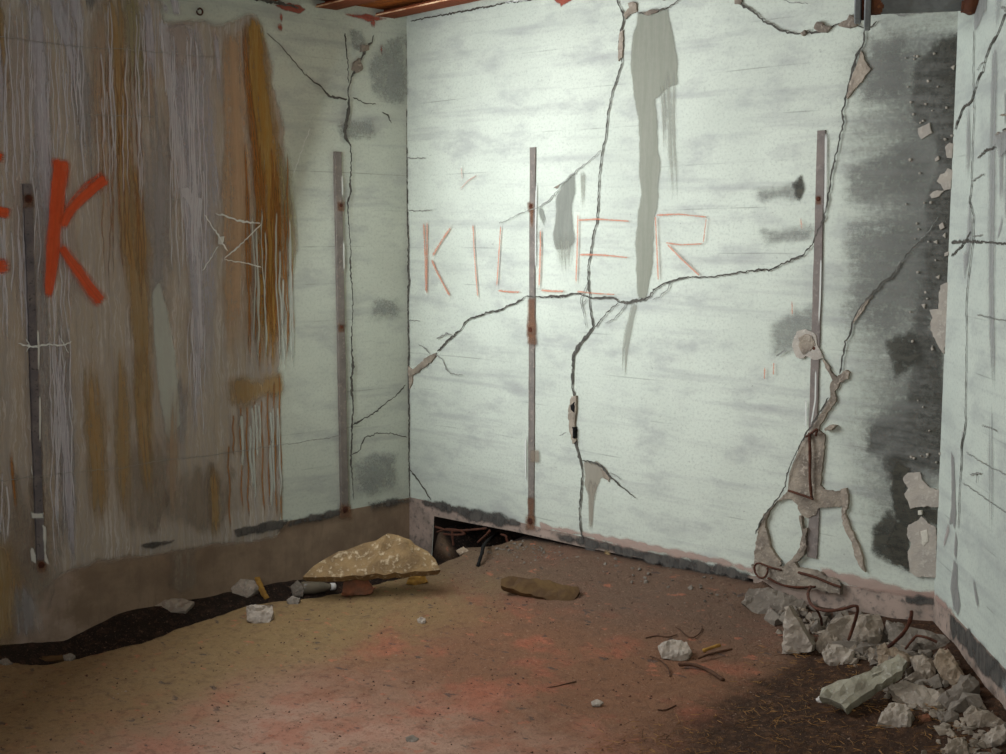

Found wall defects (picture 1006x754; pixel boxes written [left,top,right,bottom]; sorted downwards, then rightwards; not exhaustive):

corrosion [84,0,153,515]
corrosion [210,19,294,533]
crack [412,0,532,21]
leakage [623,10,678,368]
crack [437,0,934,539]
spalling [751,329,867,641]
corrosion [871,0,884,15]
leakage [852,35,960,639]
peeling [909,101,933,139]
crack [839,6,1006,521]
peeling [909,275,948,354]
peeling [923,134,954,204]